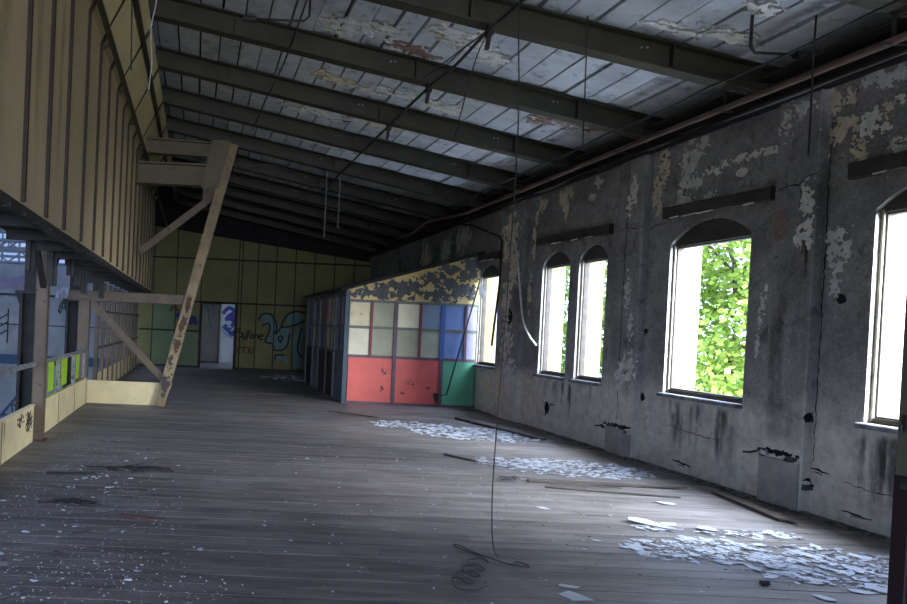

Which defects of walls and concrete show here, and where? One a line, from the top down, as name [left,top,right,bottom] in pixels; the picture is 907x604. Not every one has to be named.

peeling [317,10,513,69]
peeling [636,19,761,45]
peeling [828,63,907,161]
peeling [651,93,819,217]
peeling [626,173,638,219]
peeling [793,172,815,250]
peeling [825,224,854,304]
spalling [595,421,633,435]
spalling [742,447,801,465]
spalling [799,468,830,491]